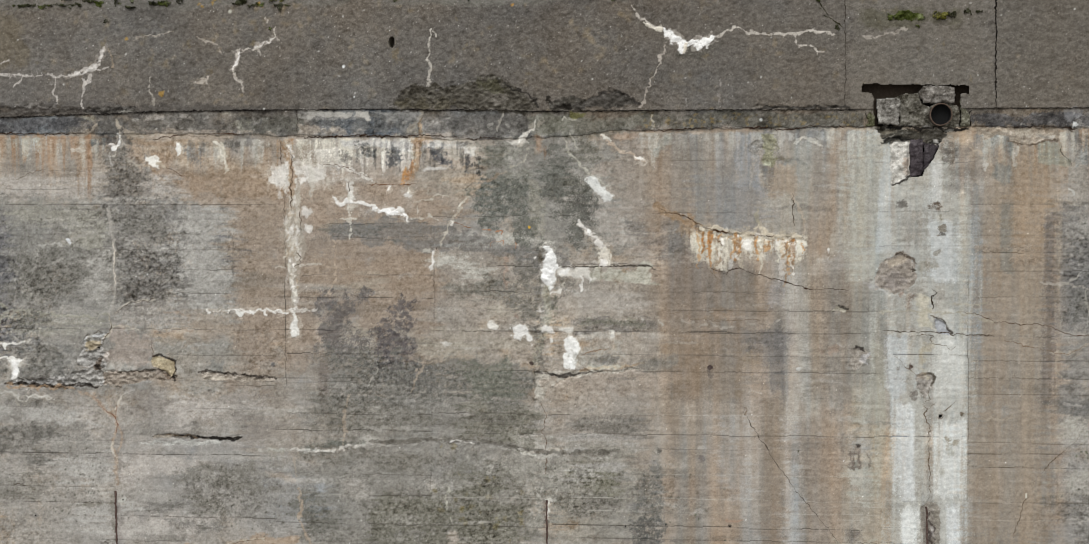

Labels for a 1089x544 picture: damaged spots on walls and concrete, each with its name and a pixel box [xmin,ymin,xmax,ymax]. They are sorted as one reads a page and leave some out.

rust [0,132,94,204]
water stain [108,131,167,169]
crack [0,2,909,296]
water stain [634,131,674,171]
spalling [874,125,1073,186]
water stain [173,132,667,419]
spalling [874,250,954,336]
peeling [4,296,277,393]
water stain [633,352,680,375]
crack [744,406,837,541]